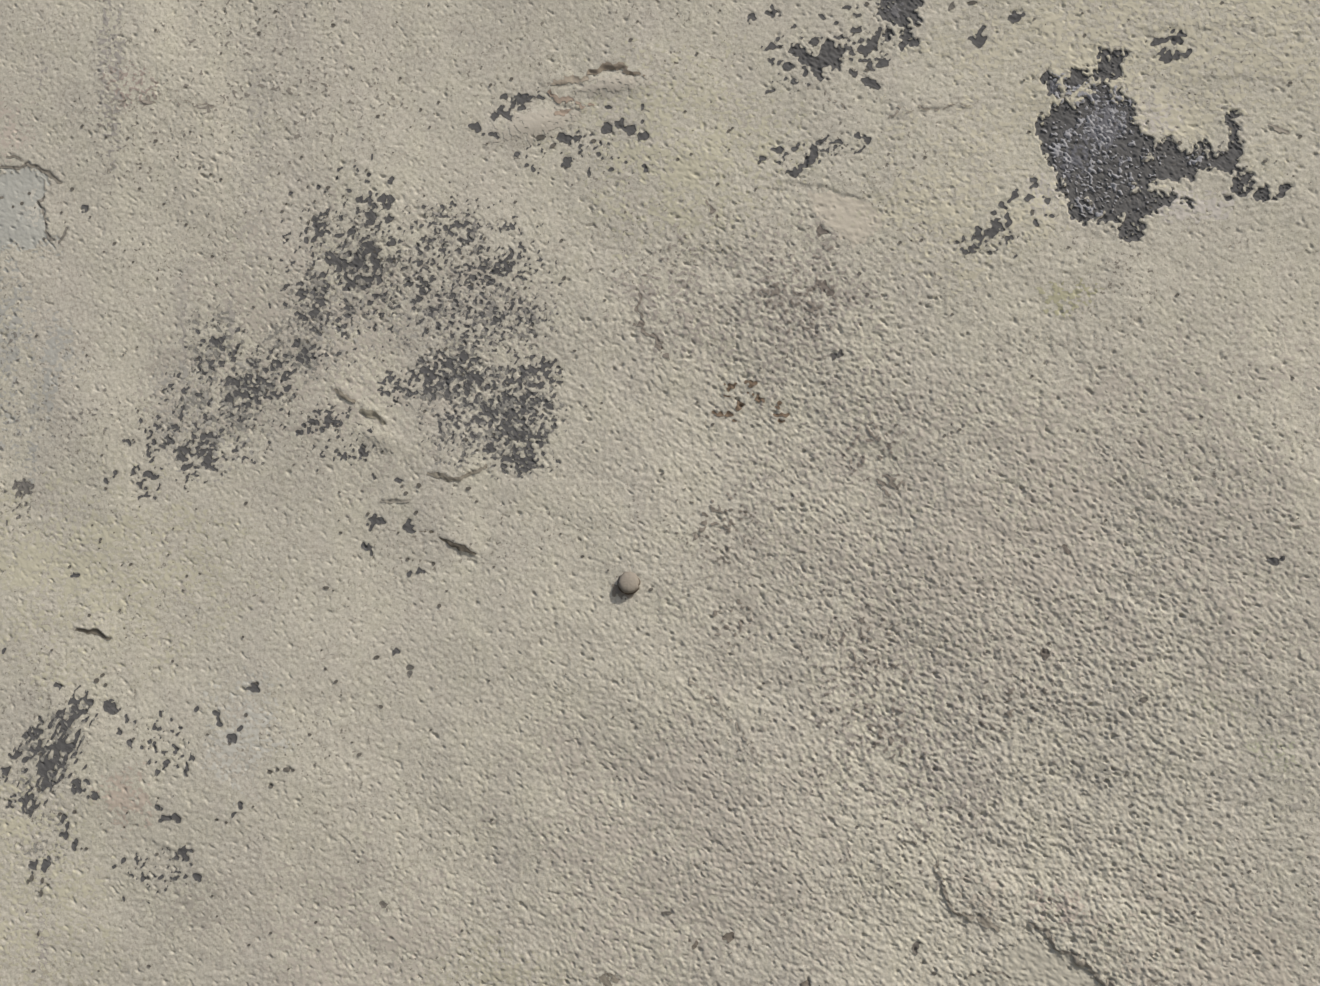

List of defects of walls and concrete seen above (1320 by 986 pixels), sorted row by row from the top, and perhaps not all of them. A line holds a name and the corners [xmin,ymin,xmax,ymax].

spalling [747,0,923,94]
peeling [1145,29,1192,63]
peeling [468,87,551,139]
peeling [514,103,649,176]
peeling [758,132,872,178]
spalling [955,47,1291,258]
peeling [103,154,572,500]
peeling [194,705,243,744]
peeling [0,682,206,892]
peeling [112,845,202,904]